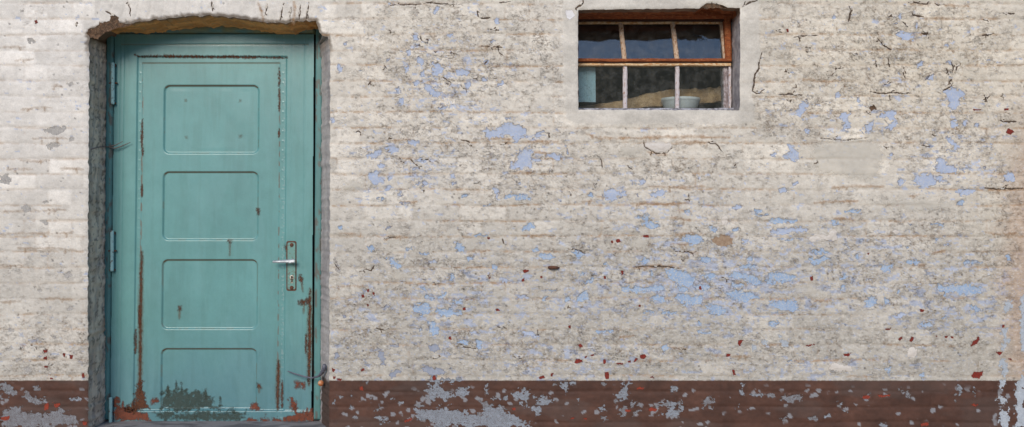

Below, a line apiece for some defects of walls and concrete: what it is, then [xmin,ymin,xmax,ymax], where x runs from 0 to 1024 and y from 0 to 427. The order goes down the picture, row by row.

spalling [86,15,132,39]
rust [134,54,287,111]
crack [752,53,802,102]
crack [569,143,672,196]
peeling [897,86,986,206]
peeling [621,204,834,357]
peeling [0,335,87,427]
rust [113,252,159,421]
rust [246,274,314,422]
peeling [332,365,579,427]
peeling [574,344,684,422]
peeling [732,370,803,410]